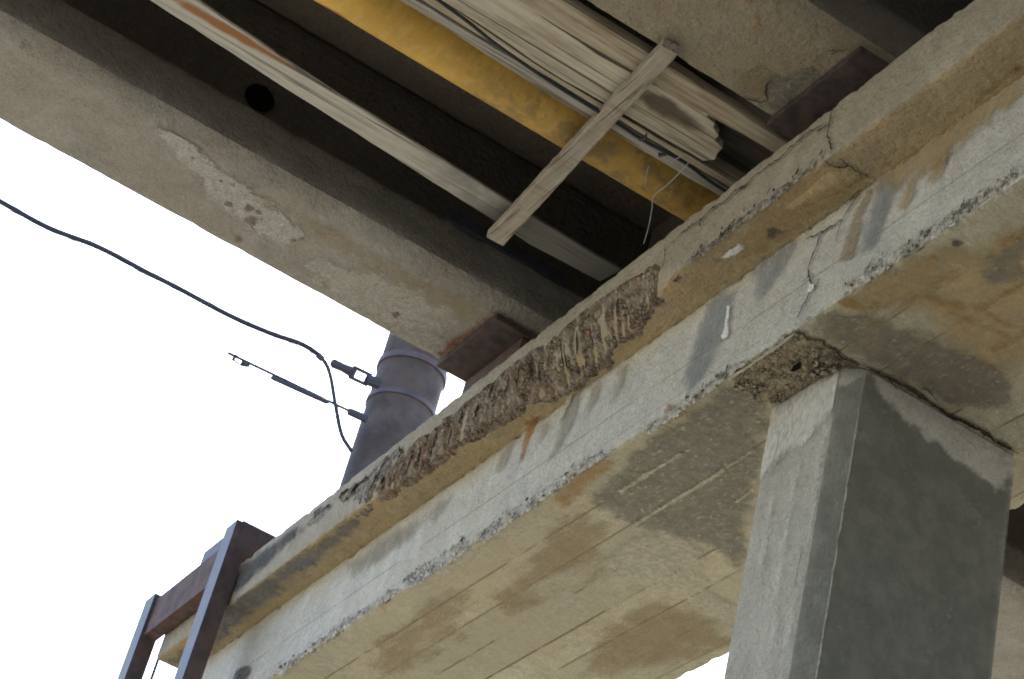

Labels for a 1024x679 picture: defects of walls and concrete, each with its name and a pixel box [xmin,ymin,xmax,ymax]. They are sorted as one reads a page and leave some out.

peeling [154,129,308,245]
spalling [307,263,665,526]
corrosion [520,418,538,459]
water stain [496,232,1024,679]
water stain [721,165,851,289]
crack [662,104,1019,454]